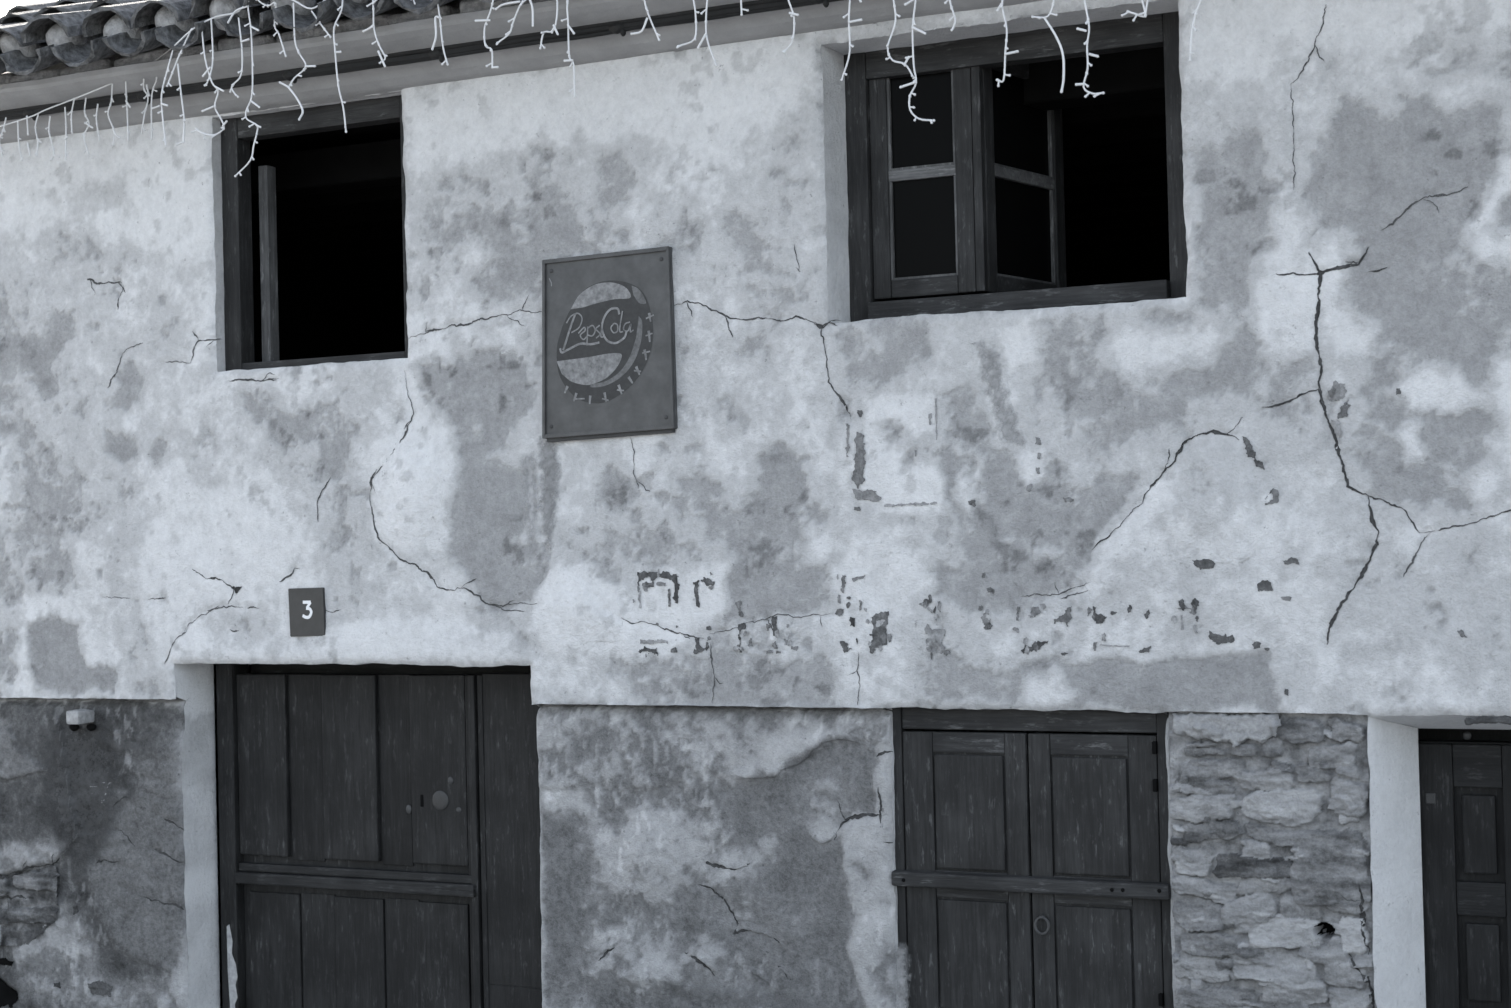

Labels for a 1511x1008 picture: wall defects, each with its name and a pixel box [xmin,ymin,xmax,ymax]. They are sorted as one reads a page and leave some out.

crack [674,300,851,417]
crack [369,295,542,612]
leakage [523,441,560,549]
peeling [845,410,937,511]
crack [1025,187,1511,644]
crack [108,568,298,662]
peeling [638,623,712,657]
peeling [835,574,892,654]
peeling [1013,604,1151,655]
flaking render [1171,598,1270,651]
crack [834,751,893,843]
flaking render [0,866,79,966]